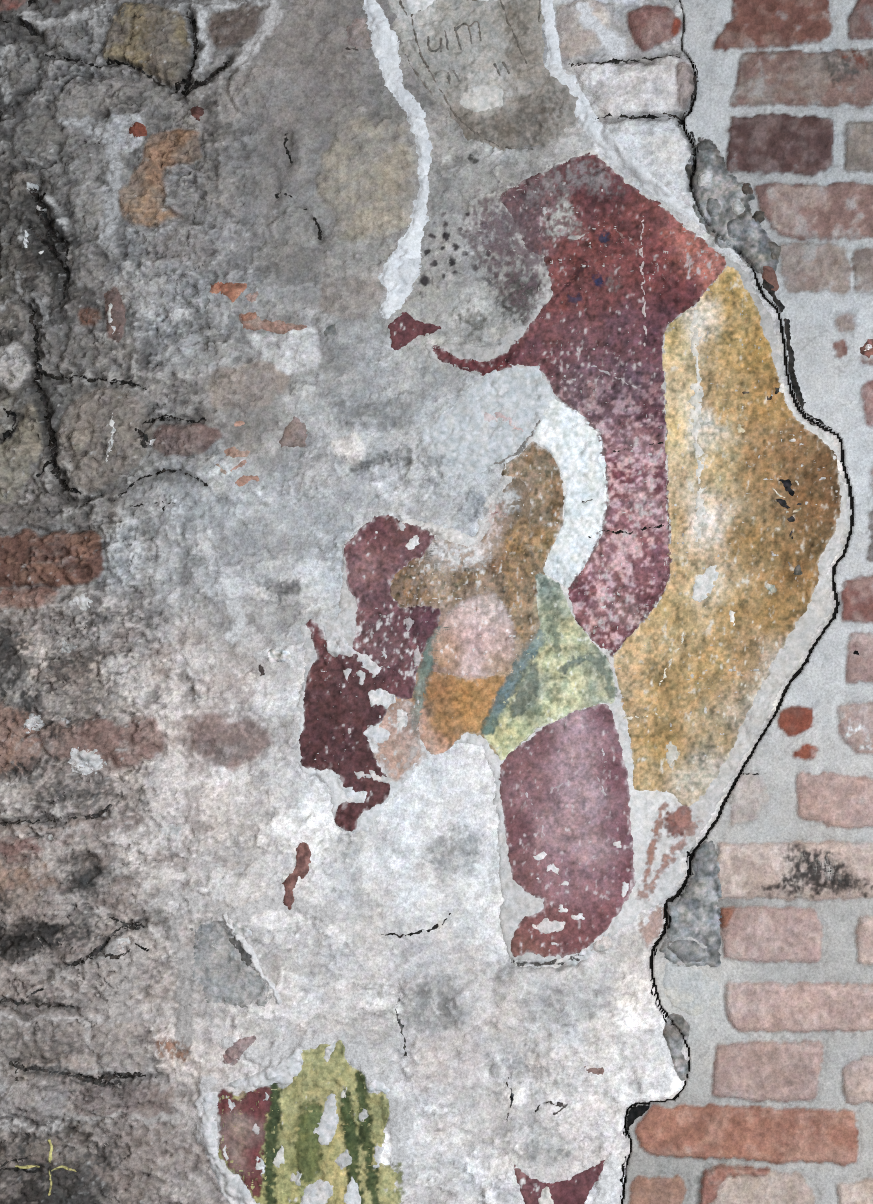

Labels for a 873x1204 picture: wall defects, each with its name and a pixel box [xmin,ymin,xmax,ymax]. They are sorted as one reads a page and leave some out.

spalling [129,122,147,138]
flaking render [80,287,127,343]
spalling [210,282,307,334]
crack [38,367,147,390]
peeling [688,310,706,542]
crack [118,468,208,507]
crack [588,524,665,538]
spalling [776,499,802,539]
peeling [692,565,719,602]
crack [620,262,854,1204]
peeling [533,851,569,886]
peeling [190,913,282,1008]